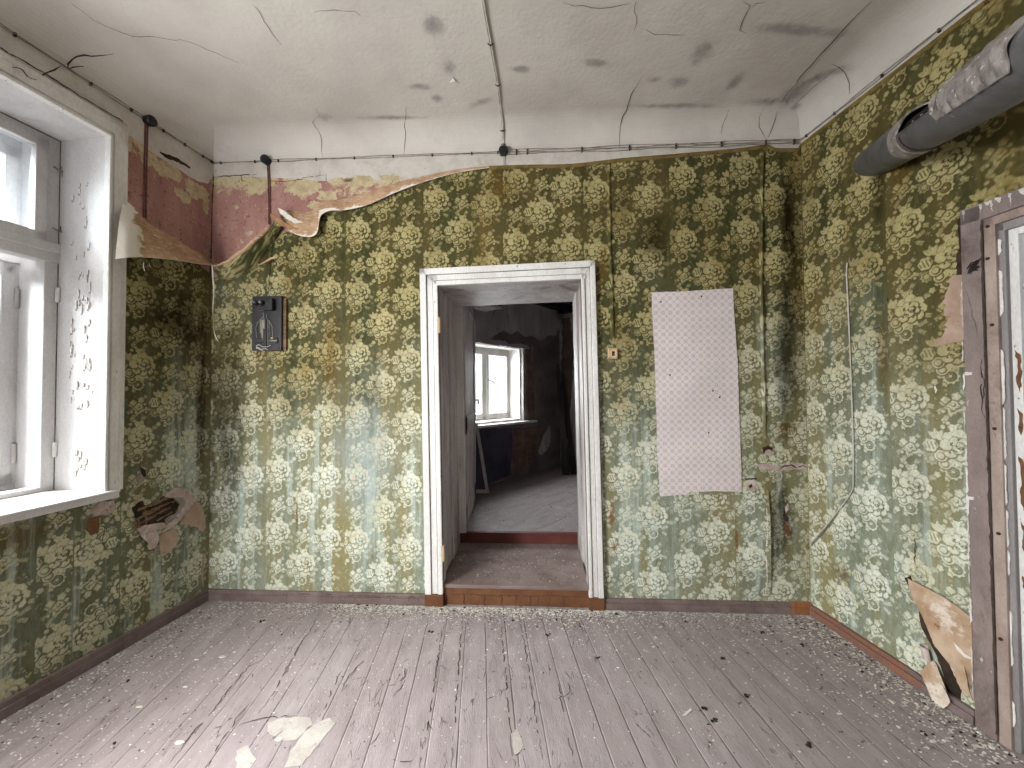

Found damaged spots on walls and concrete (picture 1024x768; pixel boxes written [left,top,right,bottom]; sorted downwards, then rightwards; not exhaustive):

crack [1,4,238,122]
crack [759,1,872,137]
peeling [138,151,210,215]
peeling [250,173,403,209]
peeling [68,241,93,410]
peeling [86,501,116,536]
flaking render [132,488,206,557]
peeling [746,446,807,595]
spalling [919,611,973,700]